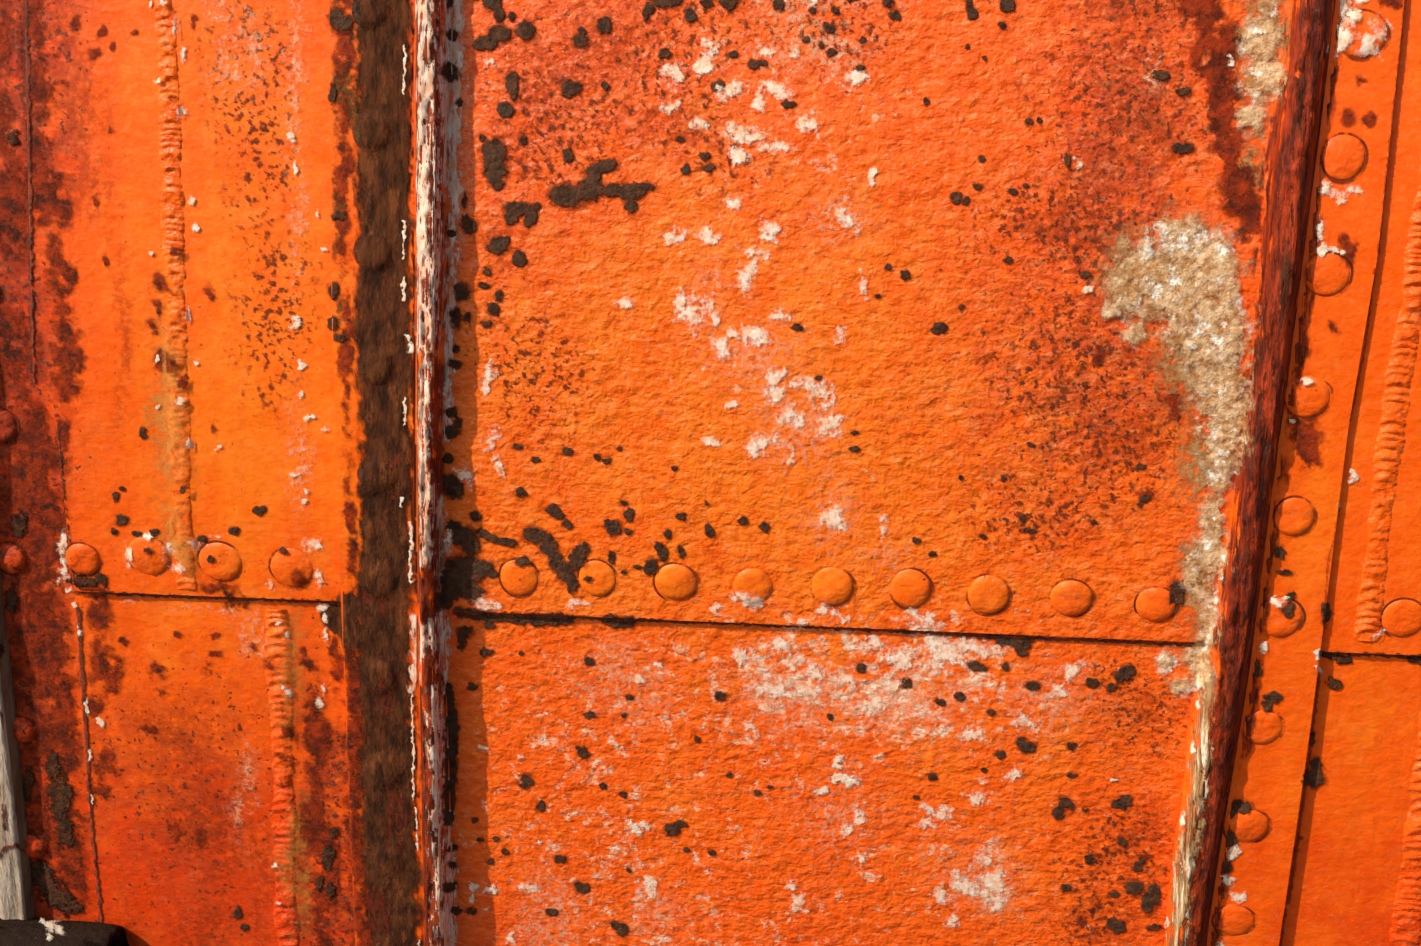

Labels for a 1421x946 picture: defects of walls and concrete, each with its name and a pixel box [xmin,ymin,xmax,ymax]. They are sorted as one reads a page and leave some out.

peeling [642,0,739,22]
corrosion [1379,0,1402,9]
peeling [662,225,722,245]
peeling [738,221,781,296]
peeling [673,268,860,464]
corrosion [0,0,449,946]
peeling [400,0,663,946]
corrosion [453,0,1376,946]
peeling [603,500,686,575]
damp [1101,216,1255,946]
peeling [1314,648,1353,691]
peeling [627,820,689,852]